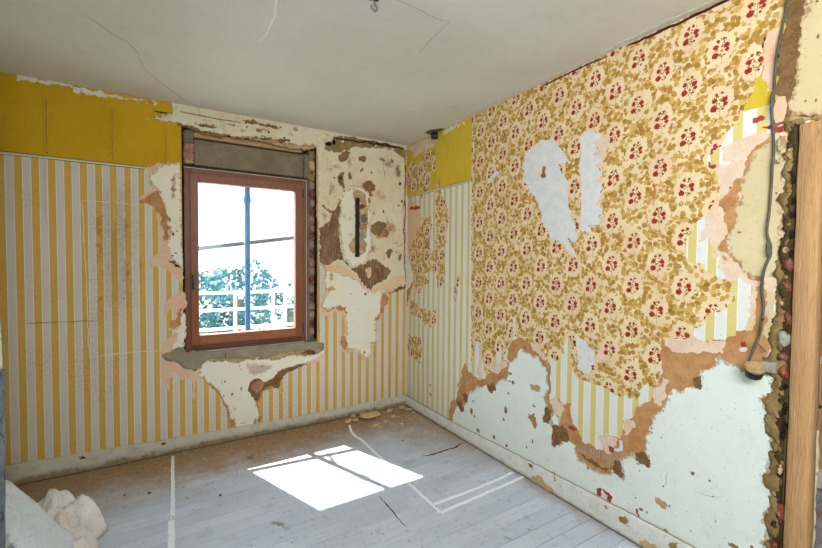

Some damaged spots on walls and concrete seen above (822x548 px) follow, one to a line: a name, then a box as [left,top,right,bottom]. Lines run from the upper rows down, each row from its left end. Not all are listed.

flaking render [16,75,157,106]
flaking render [146,103,465,186]
flaking render [149,163,183,271]
flaking render [322,186,414,359]
flaking render [452,0,822,548]
flaking render [172,313,187,350]
flaking render [196,348,325,427]